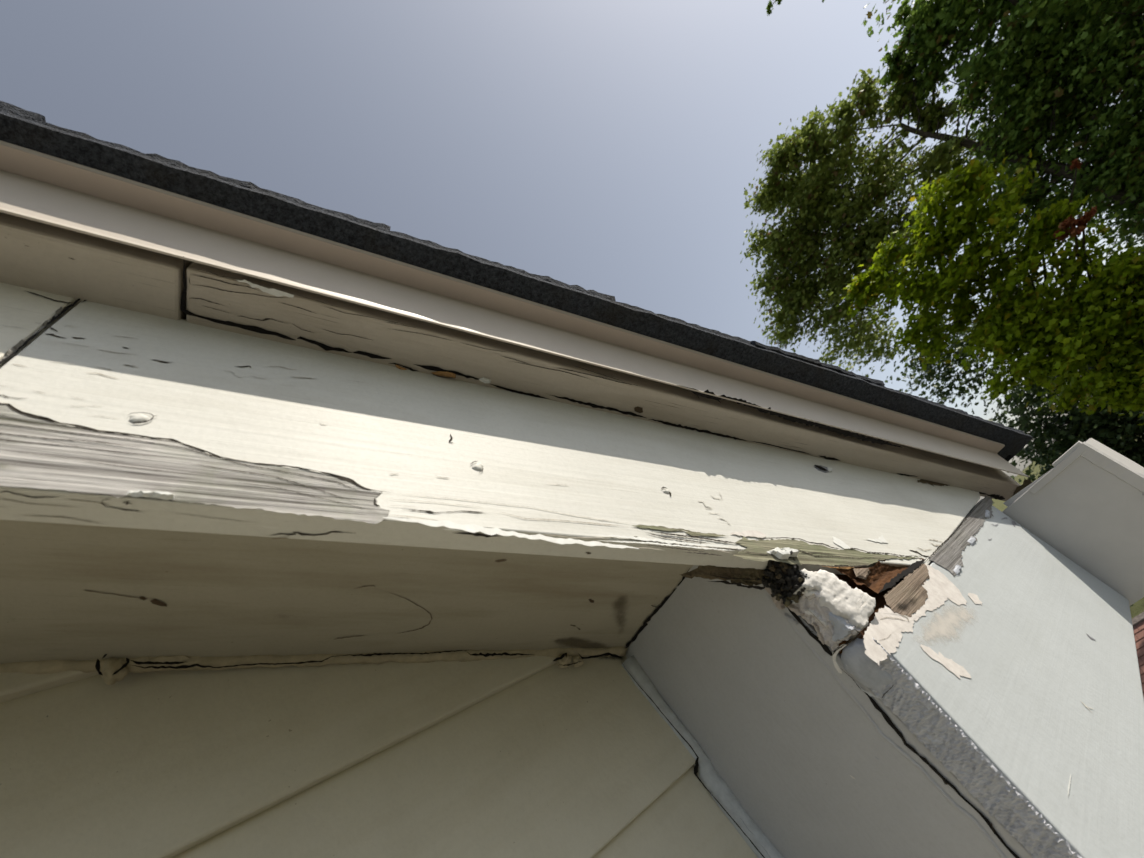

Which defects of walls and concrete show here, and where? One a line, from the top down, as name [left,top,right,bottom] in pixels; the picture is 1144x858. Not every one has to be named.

crack [0,291,173,398]
crack [189,268,648,388]
crack [0,491,110,524]
crack [71,397,154,423]
peeling [0,399,390,524]
peeling [733,495,1016,617]
peeling [1012,479,1032,497]